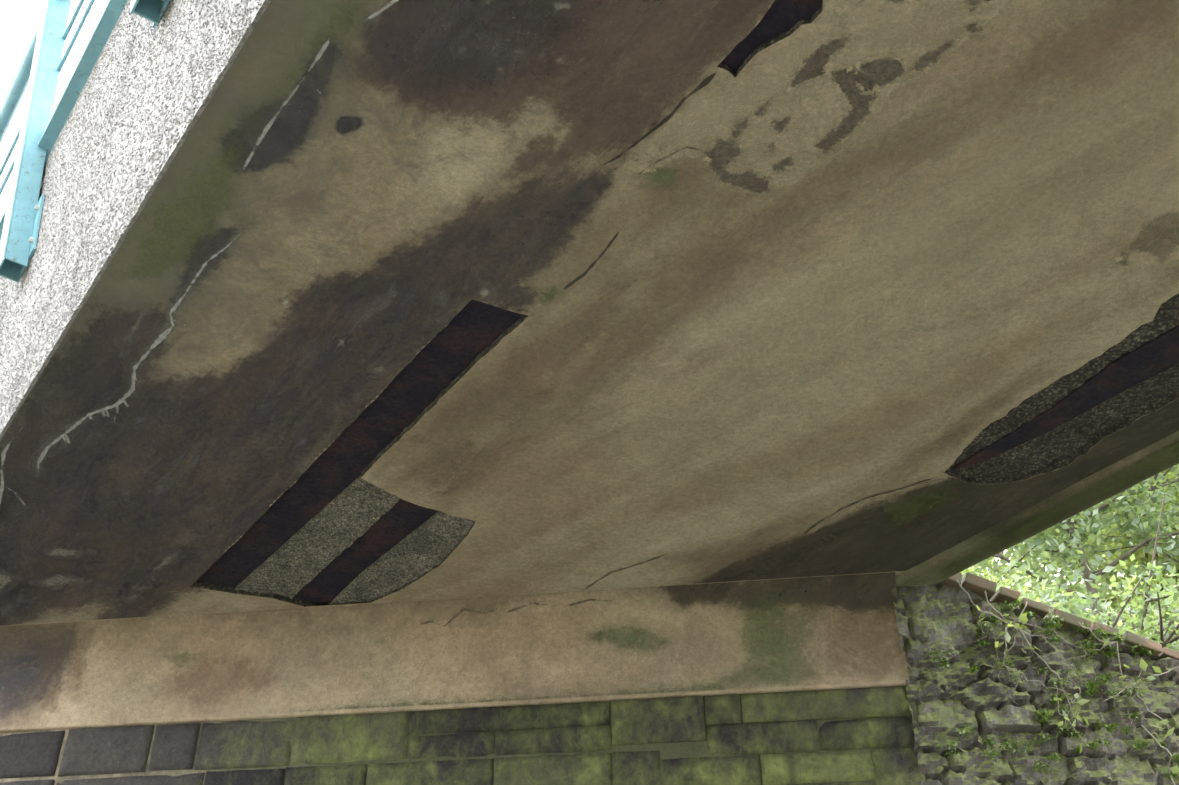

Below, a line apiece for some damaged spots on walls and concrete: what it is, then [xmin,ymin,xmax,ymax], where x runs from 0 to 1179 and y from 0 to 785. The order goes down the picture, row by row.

crack [243,38,330,170]
crack [604,73,716,174]
peeling [620,0,1012,194]
crack [564,230,620,289]
crack [0,430,25,505]
crack [37,237,237,472]
spalling [196,301,524,606]
leakage [0,0,775,718]
spalling [947,293,1179,479]